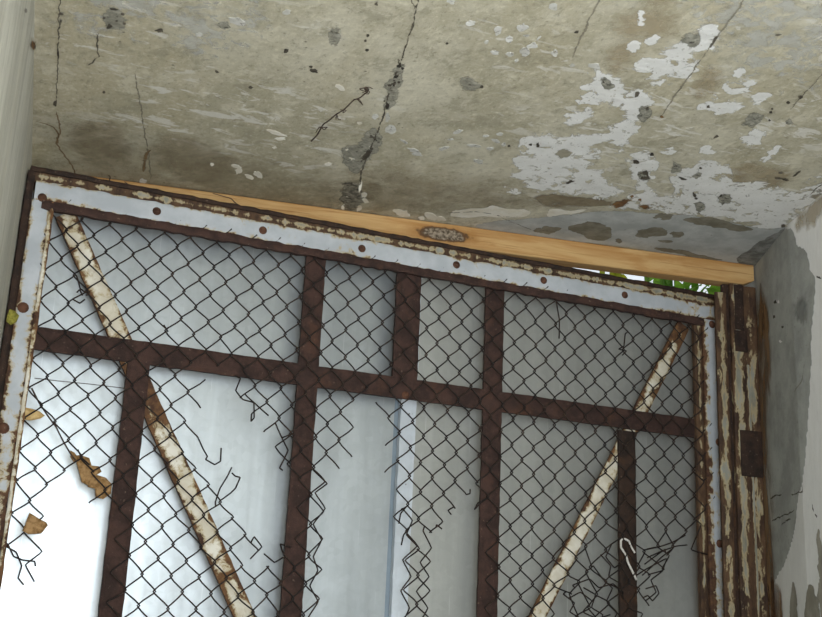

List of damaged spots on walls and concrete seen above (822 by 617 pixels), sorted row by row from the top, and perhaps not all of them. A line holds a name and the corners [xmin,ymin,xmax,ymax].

crack [573,0,600,56]
crack [662,0,744,115]
crack [37,0,75,173]
crack [343,0,419,185]
peeling [467,23,822,229]
peeling [393,205,531,230]
leakage [535,194,611,207]
leakage [534,221,622,243]
leakage [635,213,722,260]
leakage [684,217,753,232]
peeling [790,529,822,617]